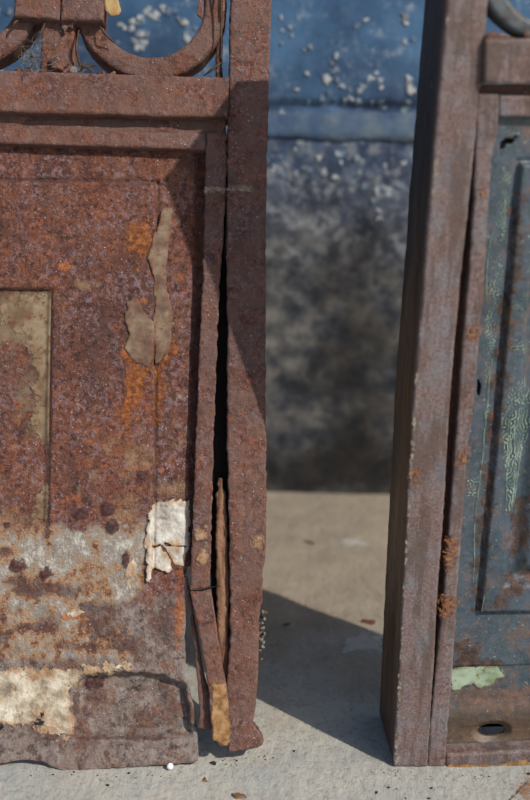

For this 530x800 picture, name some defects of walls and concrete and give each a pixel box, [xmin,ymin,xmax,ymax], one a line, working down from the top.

peeling [124,207,173,367]
corrosion [119,335,184,431]
corrosion [470,194,530,612]
corrosion [9,559,28,573]
corrosion [100,502,120,534]
spalling [124,499,208,589]
corrosion [443,533,460,575]
corrosion [437,594,460,619]
peeling [0,659,132,742]
corrosion [84,675,104,690]
peeling [451,639,504,691]